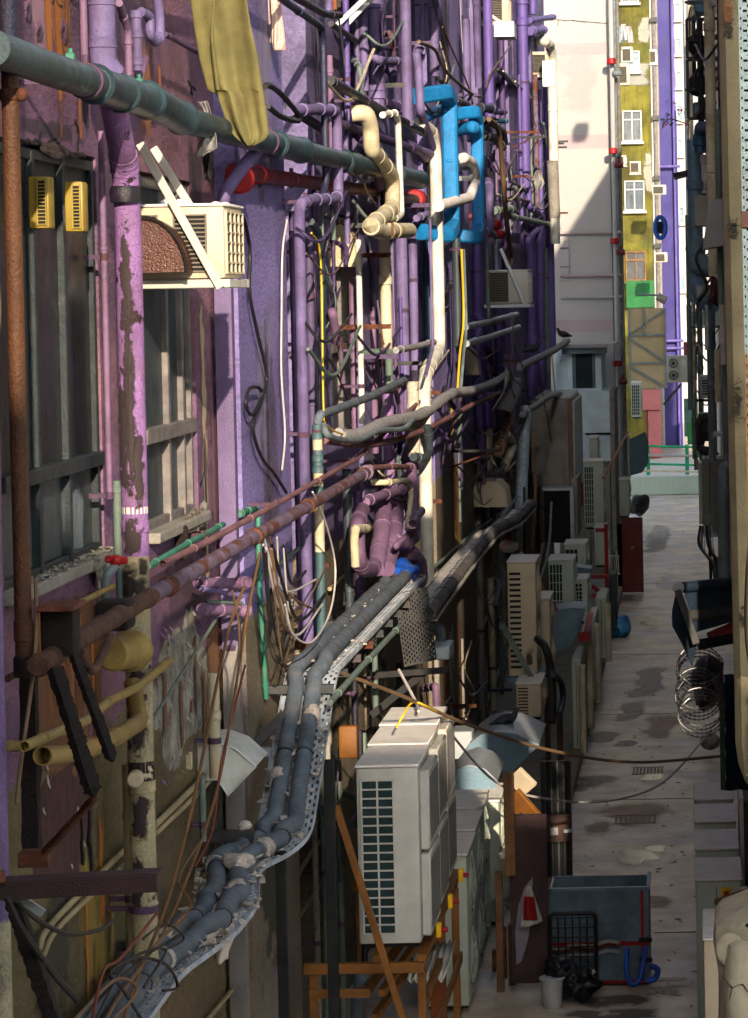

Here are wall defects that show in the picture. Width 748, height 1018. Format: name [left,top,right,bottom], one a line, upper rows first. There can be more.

rust [45,0,70,56]
peeling [119,221,148,598]
spalling [127,606,207,786]
peeling [133,796,150,840]